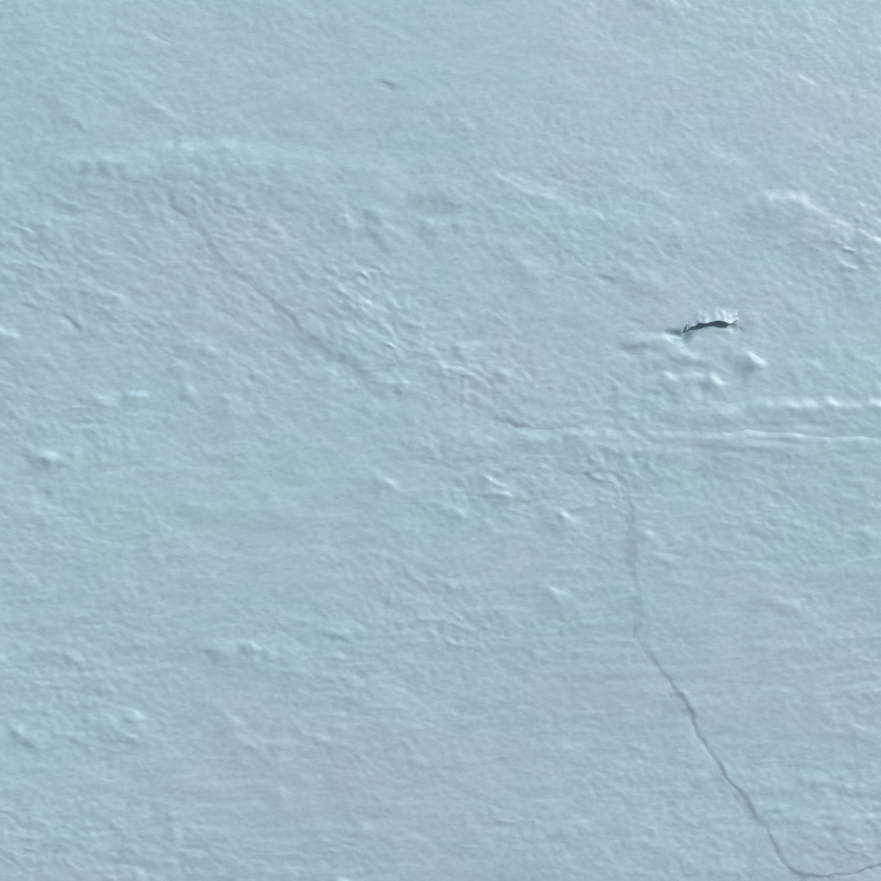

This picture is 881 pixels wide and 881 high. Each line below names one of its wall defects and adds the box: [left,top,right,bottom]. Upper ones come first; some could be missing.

spalling [615,307,739,355]
crack [491,417,591,436]
crack [494,465,558,505]
crack [557,359,881,881]